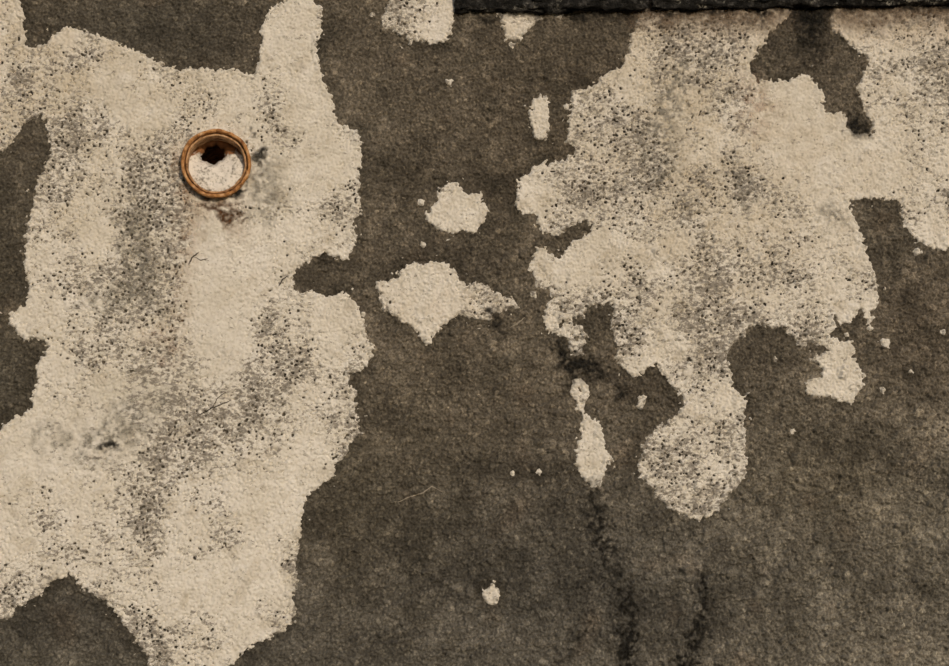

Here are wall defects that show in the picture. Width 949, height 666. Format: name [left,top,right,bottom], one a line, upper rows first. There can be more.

peeling [369,0,455,49]
peeling [496,11,562,49]
peeling [418,178,490,241]
peeling [0,0,376,666]
peeling [375,255,520,346]
peeling [514,0,949,522]